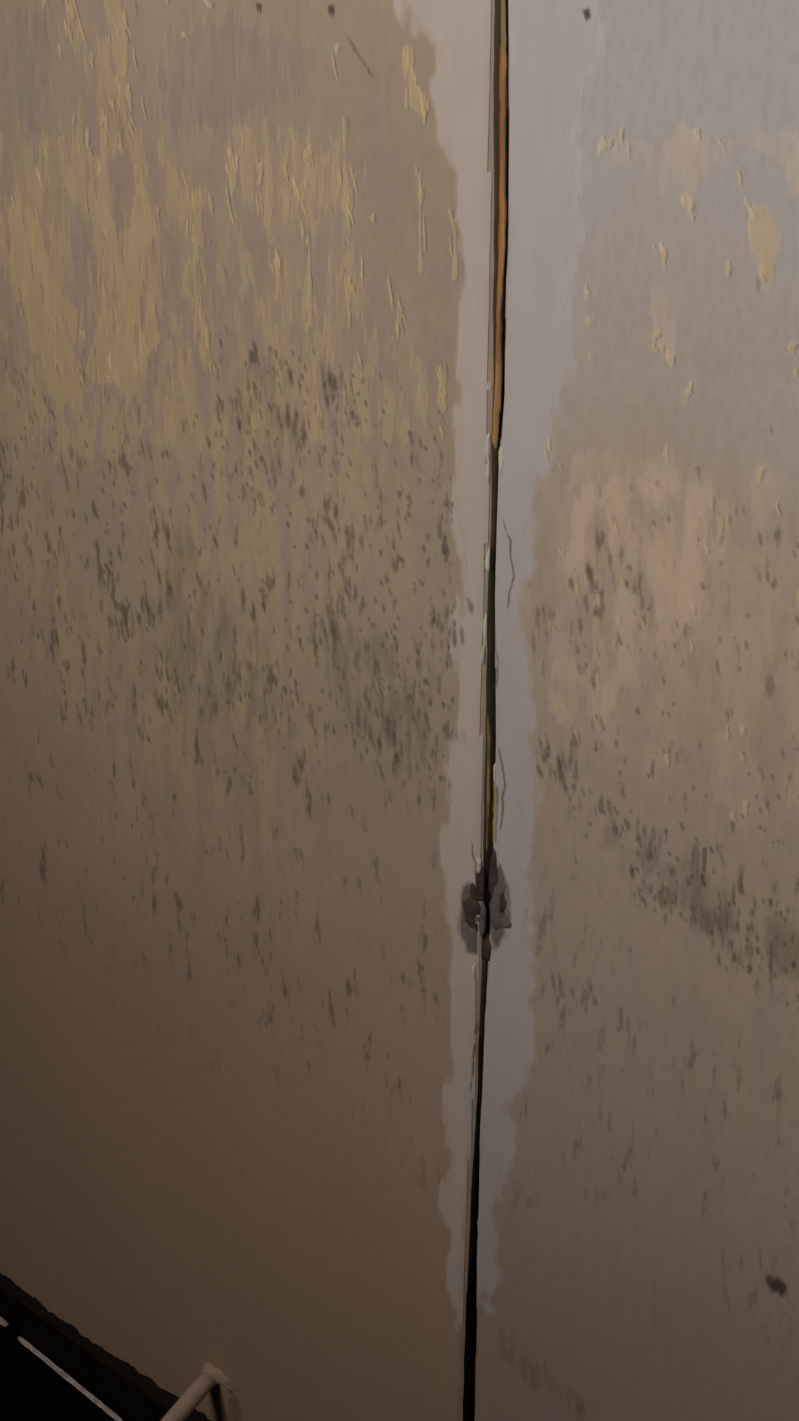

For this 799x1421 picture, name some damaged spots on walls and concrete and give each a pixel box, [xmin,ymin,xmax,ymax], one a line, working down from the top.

spalling [461,848,512,961]